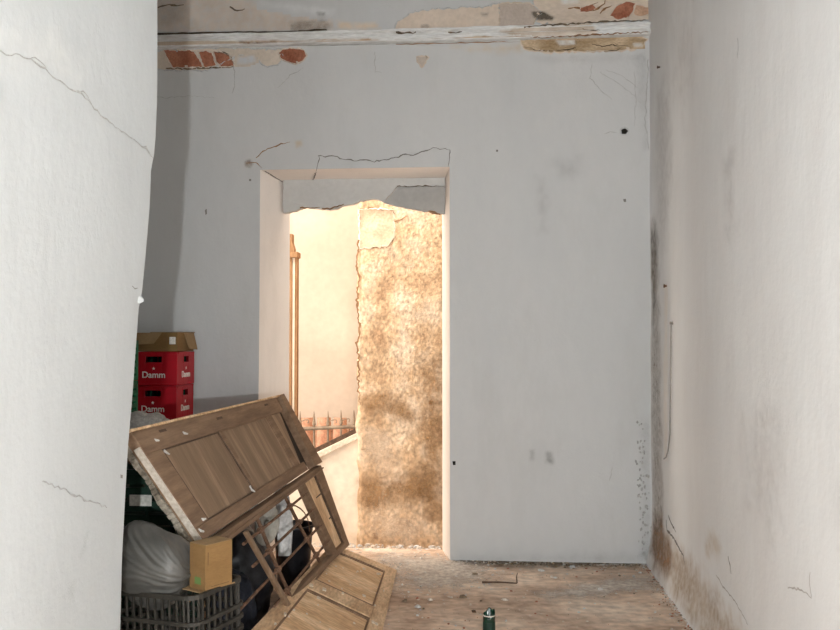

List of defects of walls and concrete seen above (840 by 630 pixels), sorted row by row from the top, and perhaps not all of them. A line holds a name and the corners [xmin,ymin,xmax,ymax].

peeling [157,0,383,73]
flaking render [393,0,649,54]
crack [0,50,153,158]
crack [250,142,289,182]
crack [312,147,451,180]
flaking render [358,207,396,250]
crack [42,481,107,508]